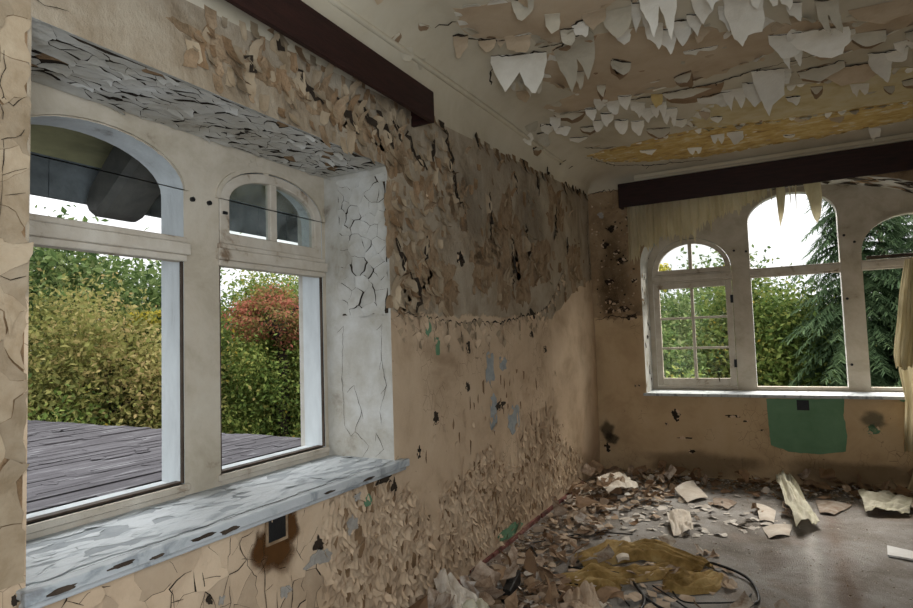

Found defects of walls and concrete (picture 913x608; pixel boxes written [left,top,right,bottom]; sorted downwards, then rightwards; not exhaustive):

crack [0,0,707,608]
peeling [31,0,913,435]
crack [631,55,815,100]